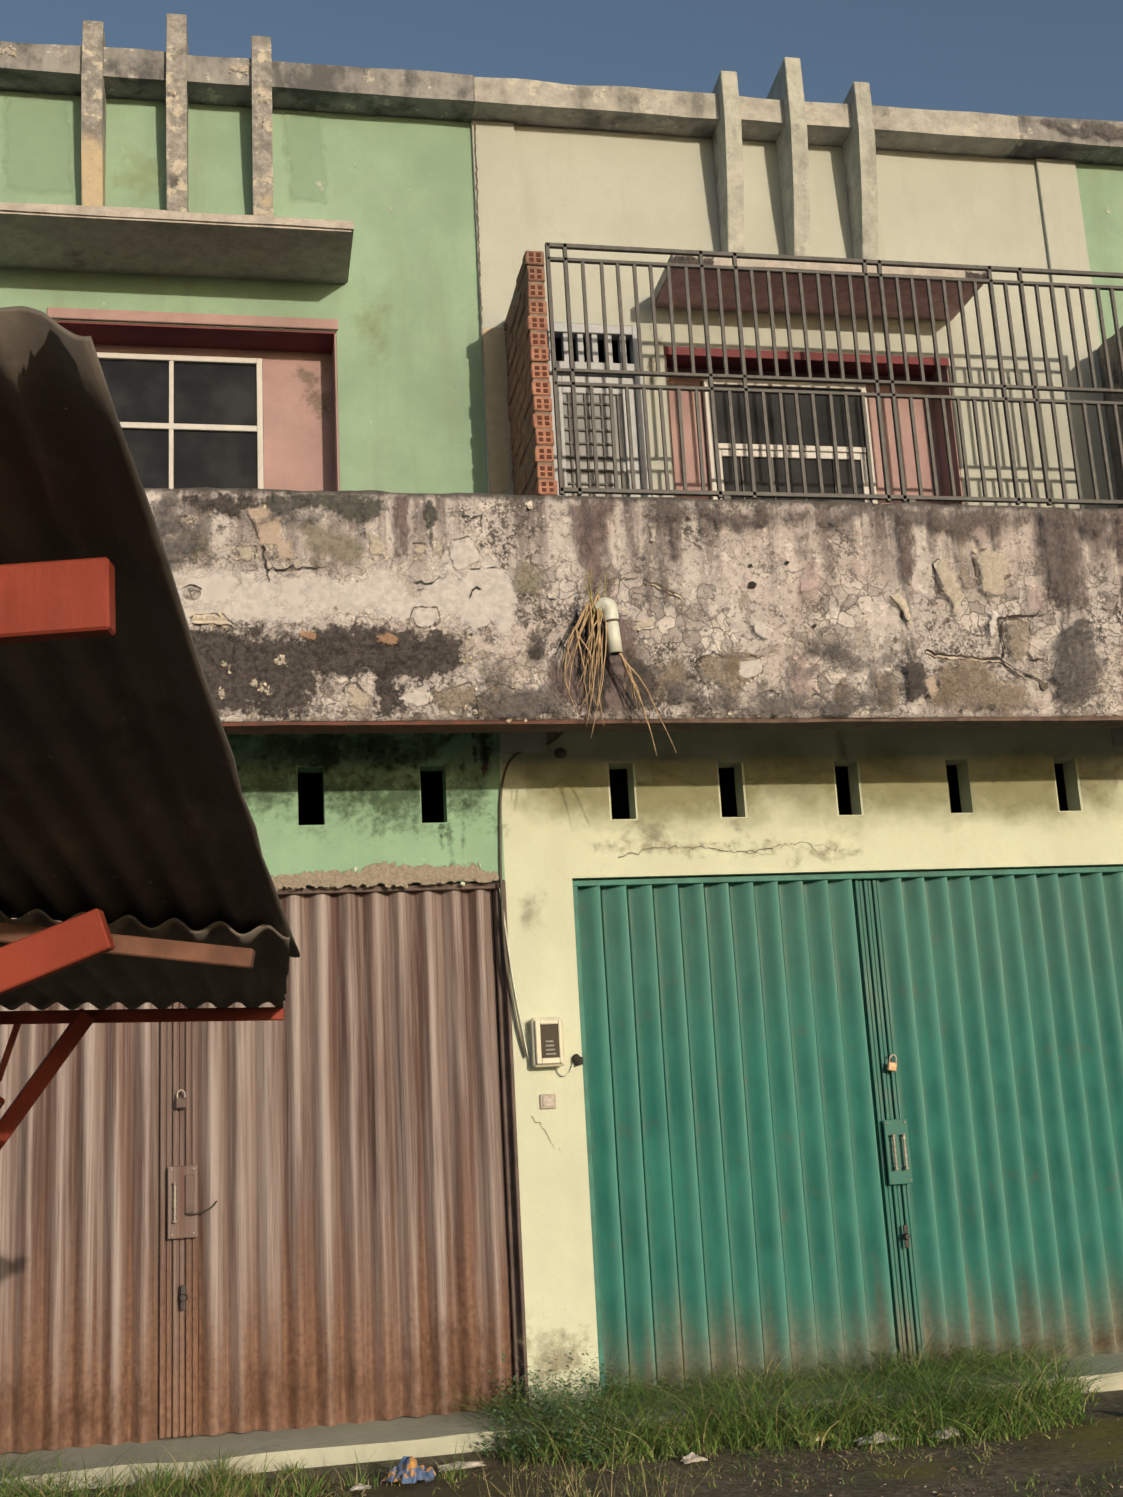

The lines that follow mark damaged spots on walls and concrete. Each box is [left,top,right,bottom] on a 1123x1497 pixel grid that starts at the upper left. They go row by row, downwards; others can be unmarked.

peeling [233,504,299,568]
peeling [450,535,483,572]
spalling [189,611,237,630]
leakage [151,490,540,720]
peeling [409,606,441,631]
leakage [471,499,1042,776]
leakage [635,499,1123,713]
spalling [933,547,1033,661]
peeling [345,681,371,712]